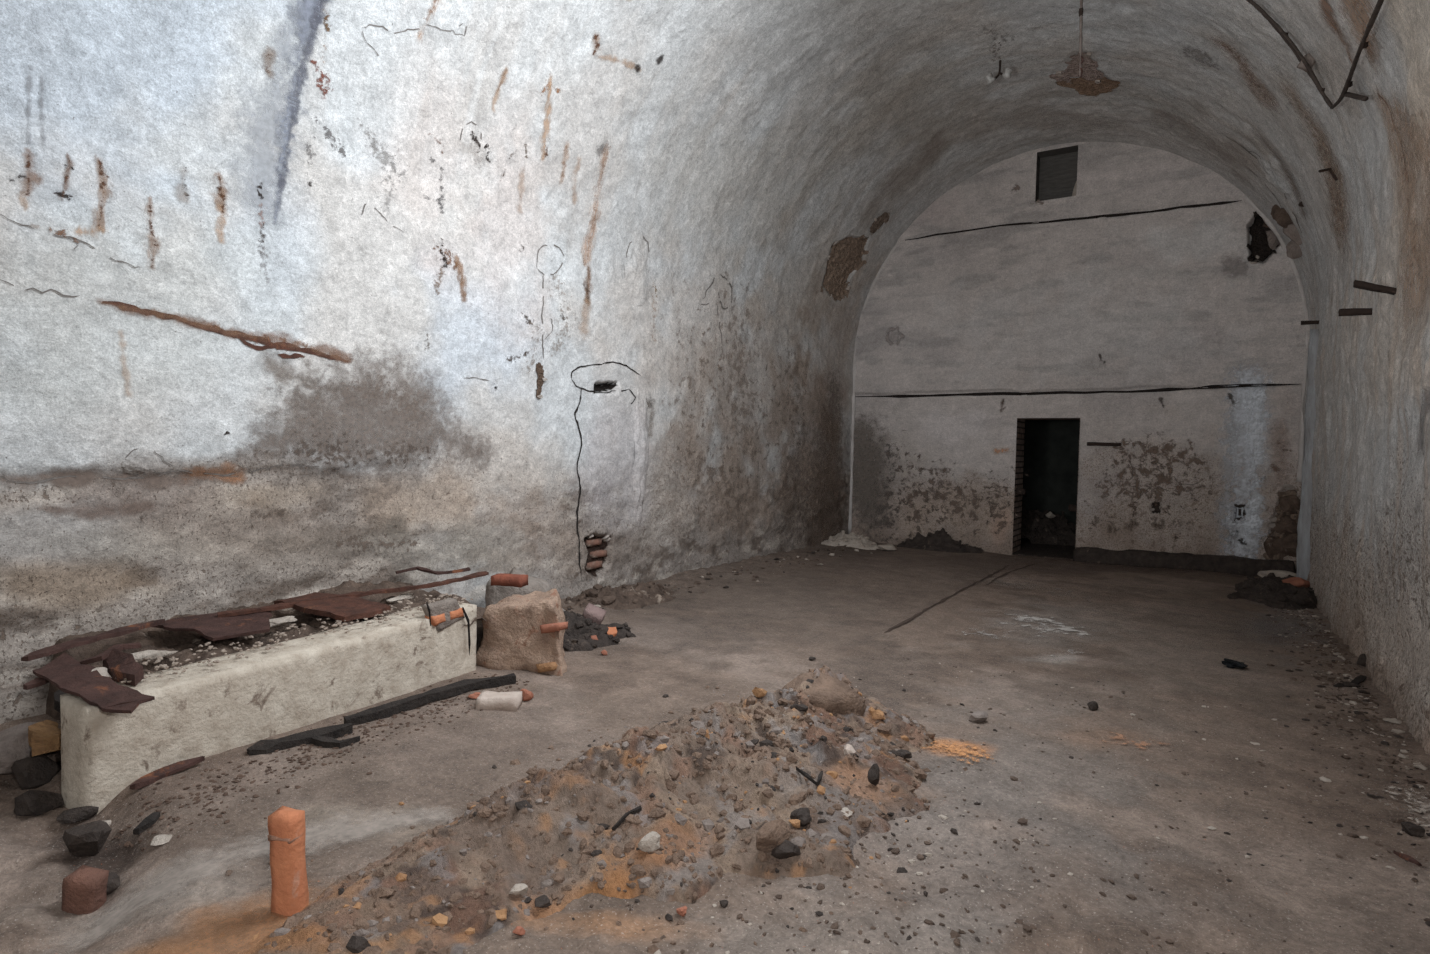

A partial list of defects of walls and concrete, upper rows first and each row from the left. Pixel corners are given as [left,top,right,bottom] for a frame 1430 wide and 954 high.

peeling [1049,52,1105,84]
damp [306,120,346,163]
rust [49,155,109,243]
rust [216,177,225,213]
rust [584,204,598,303]
flaking render [821,212,890,301]
spalling [1247,204,1303,264]
rust [121,306,351,362]
damp [46,358,488,518]
damp [2,470,96,487]
damp [335,533,417,555]
spalling [584,534,611,576]